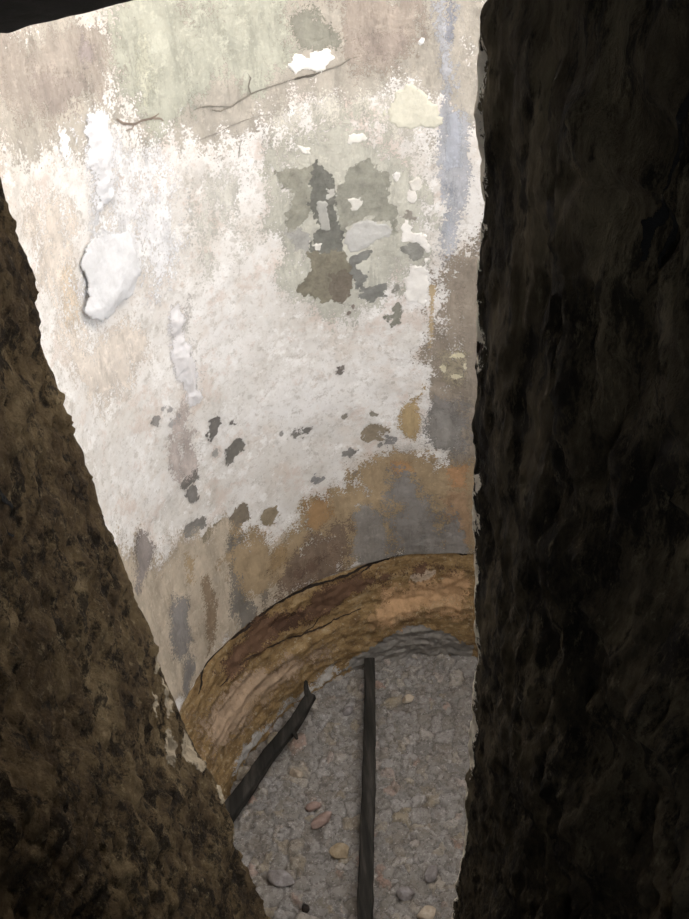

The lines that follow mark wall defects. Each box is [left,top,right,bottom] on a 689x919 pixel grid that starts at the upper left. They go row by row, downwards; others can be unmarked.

crack [116,113,164,131]
crack [195,56,359,155]
flaking render [347,133,368,145]
flaking render [80,213,142,323]
flaking render [273,145,431,328]
damp [115,510,292,702]